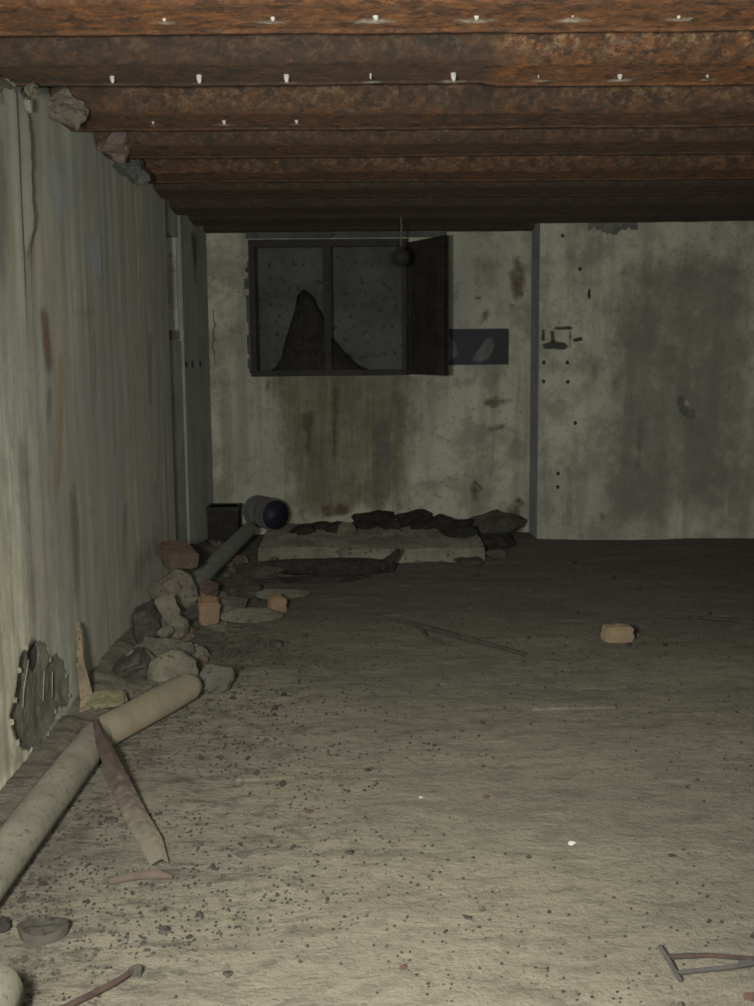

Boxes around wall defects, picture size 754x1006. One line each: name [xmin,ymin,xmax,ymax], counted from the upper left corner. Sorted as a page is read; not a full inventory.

peeling [10,639,71,752]